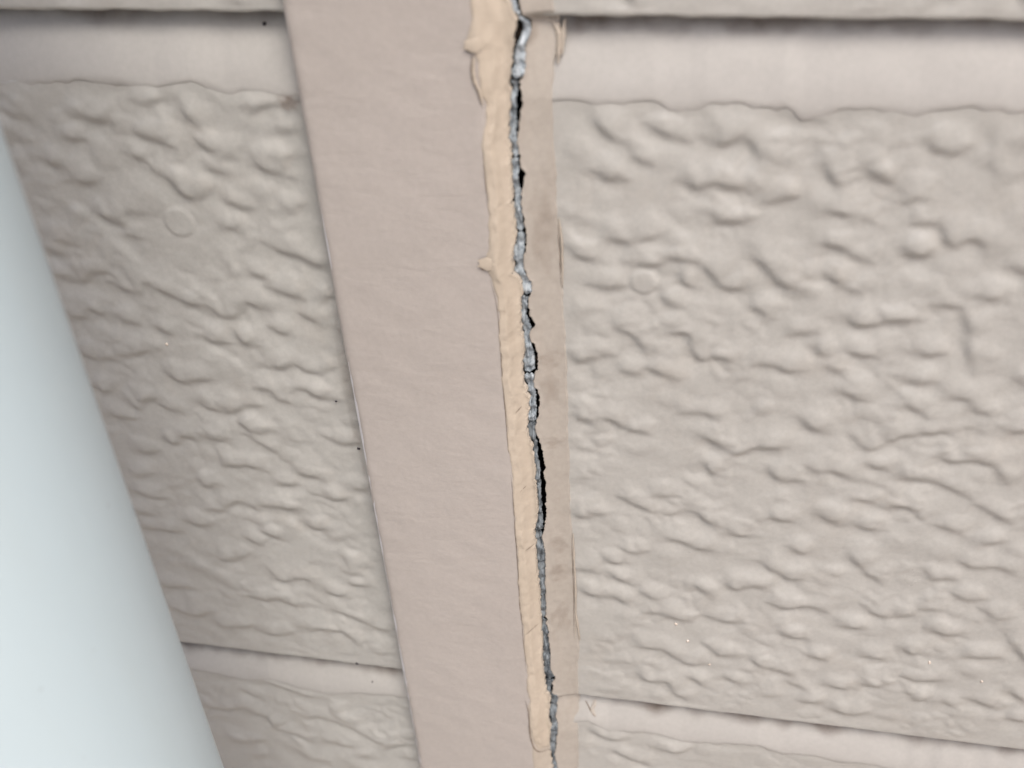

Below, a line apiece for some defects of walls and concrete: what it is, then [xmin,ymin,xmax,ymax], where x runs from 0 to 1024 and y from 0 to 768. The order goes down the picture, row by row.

crack [490,0,558,768]